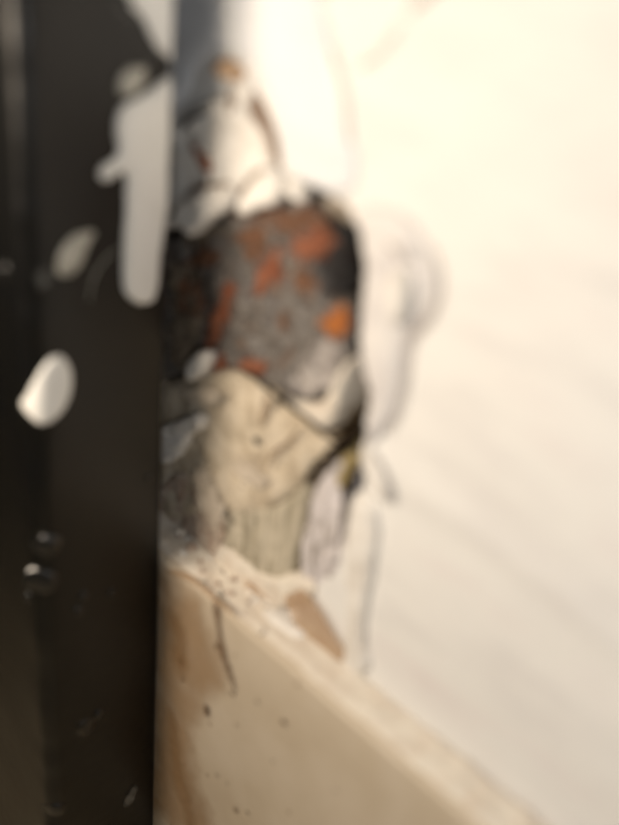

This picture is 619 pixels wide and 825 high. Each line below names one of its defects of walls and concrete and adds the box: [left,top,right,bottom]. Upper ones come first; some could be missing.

peeling [170,57,357,236]
corrosion [252,225,337,295]
corrosion [204,281,236,371]
corrosion [318,304,350,339]
hole [160,348,371,607]